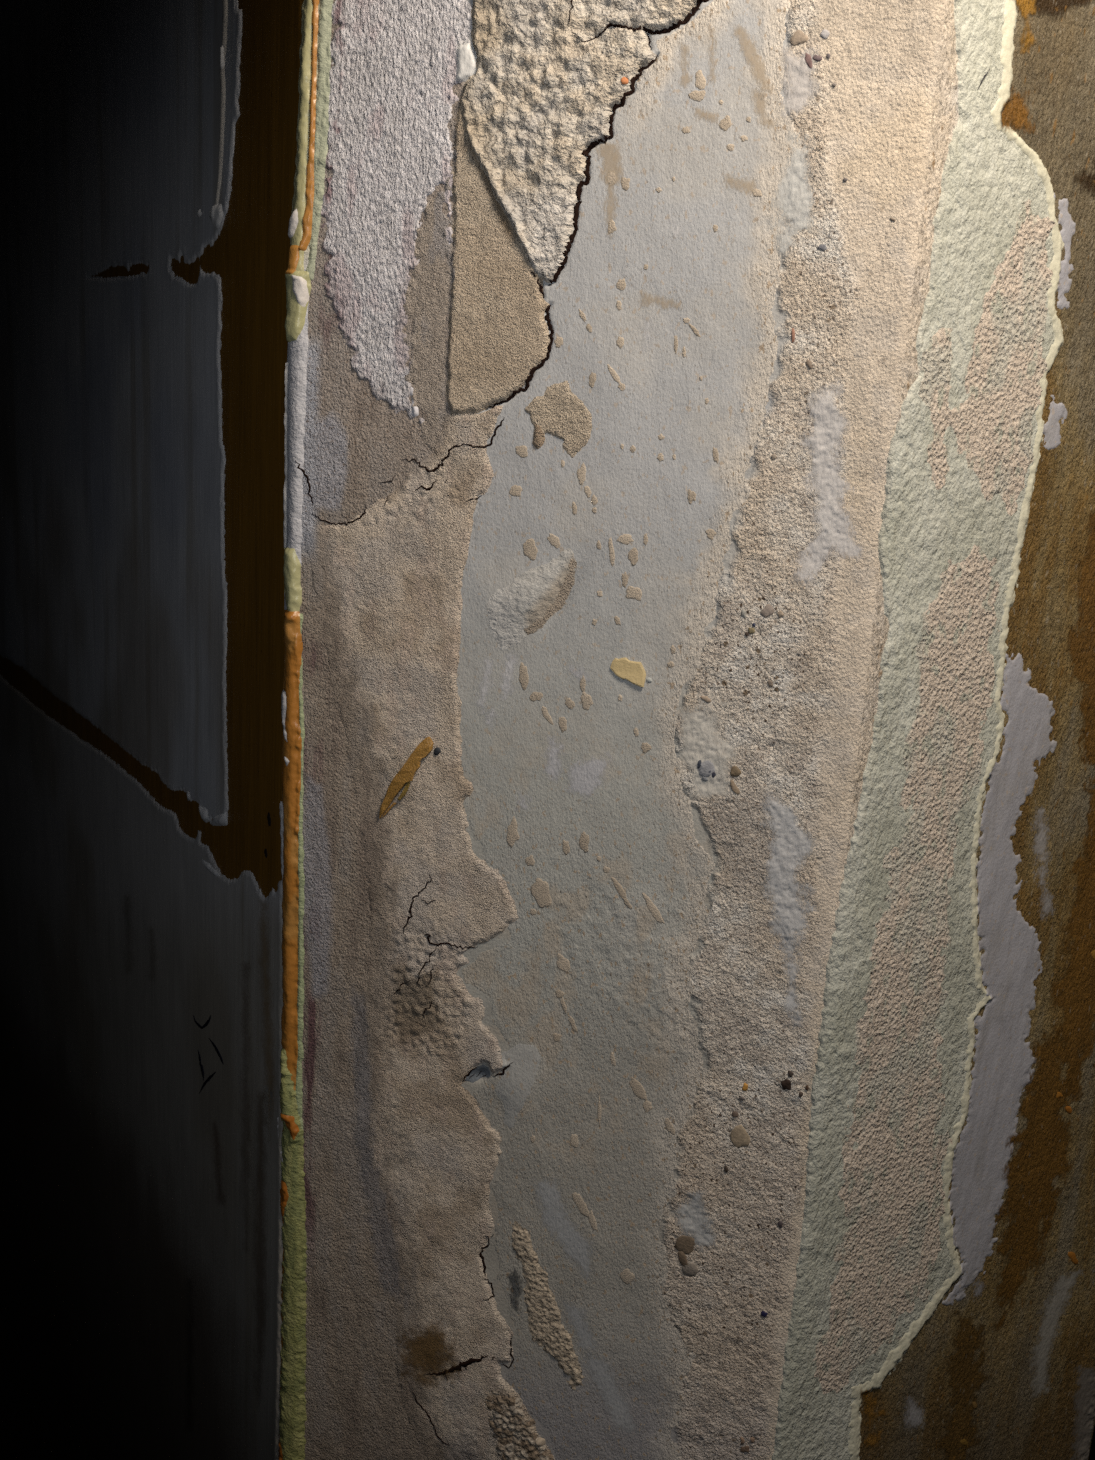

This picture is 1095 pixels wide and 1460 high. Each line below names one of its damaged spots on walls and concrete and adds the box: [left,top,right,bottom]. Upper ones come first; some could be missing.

corrosion [1016,0,1036,53]
corrosion [1001,93,1034,133]
peeling [197,204,223,228]
crack [295,0,709,526]
peeling [281,690,289,766]
spalling [291,0,830,1460]
peeling [772,0,1064,1460]
crack [393,873,477,1016]
corrosion [937,513,1095,1460]